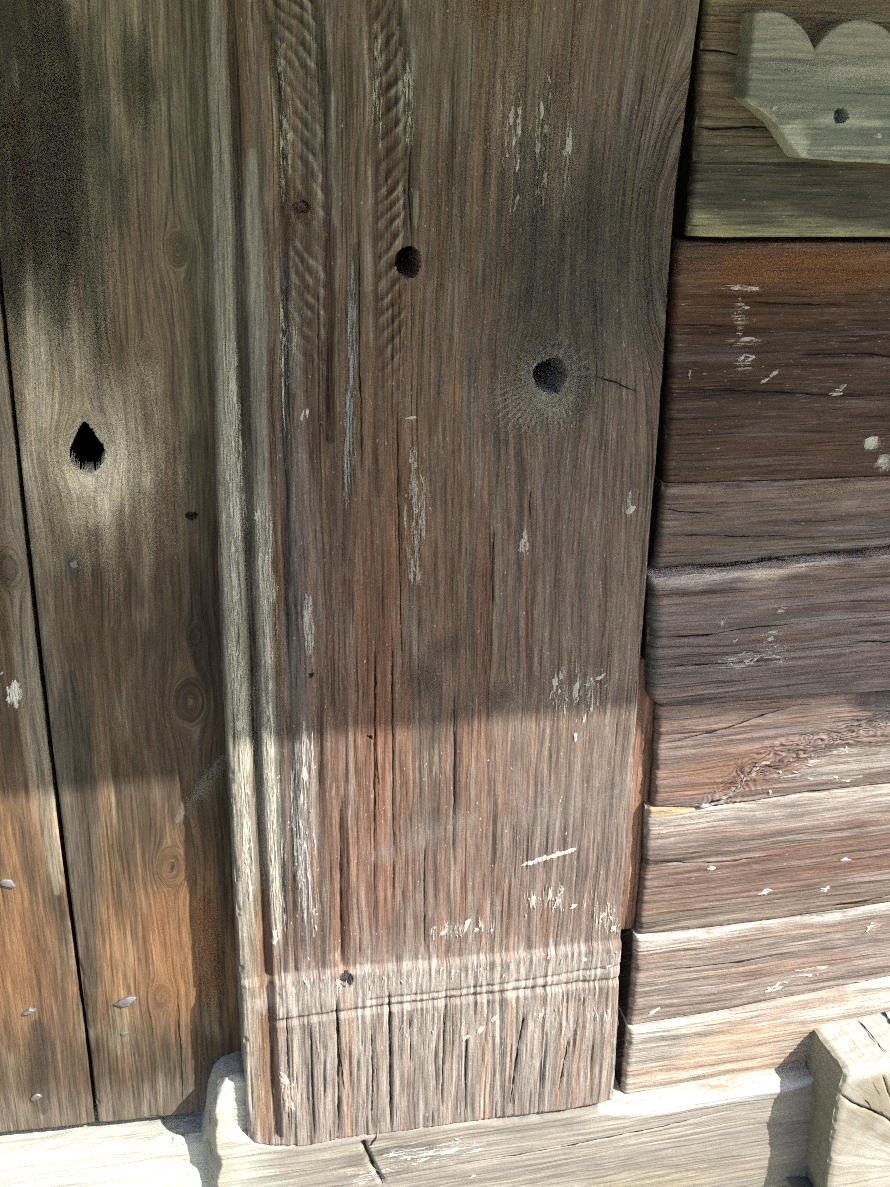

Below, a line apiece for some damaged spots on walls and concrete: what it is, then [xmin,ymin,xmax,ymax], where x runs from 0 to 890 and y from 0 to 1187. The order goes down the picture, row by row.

water stain [0,0,106,365]
crack [702,751,783,805]
crack [286,802,411,1183]
crack [441,1008,468,1107]
crack [842,1012,890,1121]